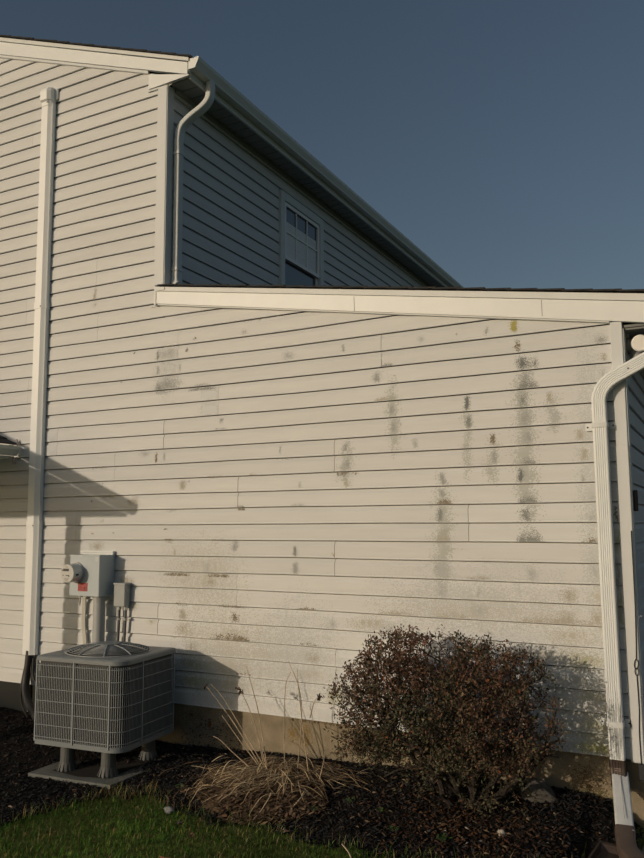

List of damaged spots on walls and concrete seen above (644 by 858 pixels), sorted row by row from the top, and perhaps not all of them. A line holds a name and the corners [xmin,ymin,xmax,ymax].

damp [425,472,463,598]
damp [458,348,571,542]